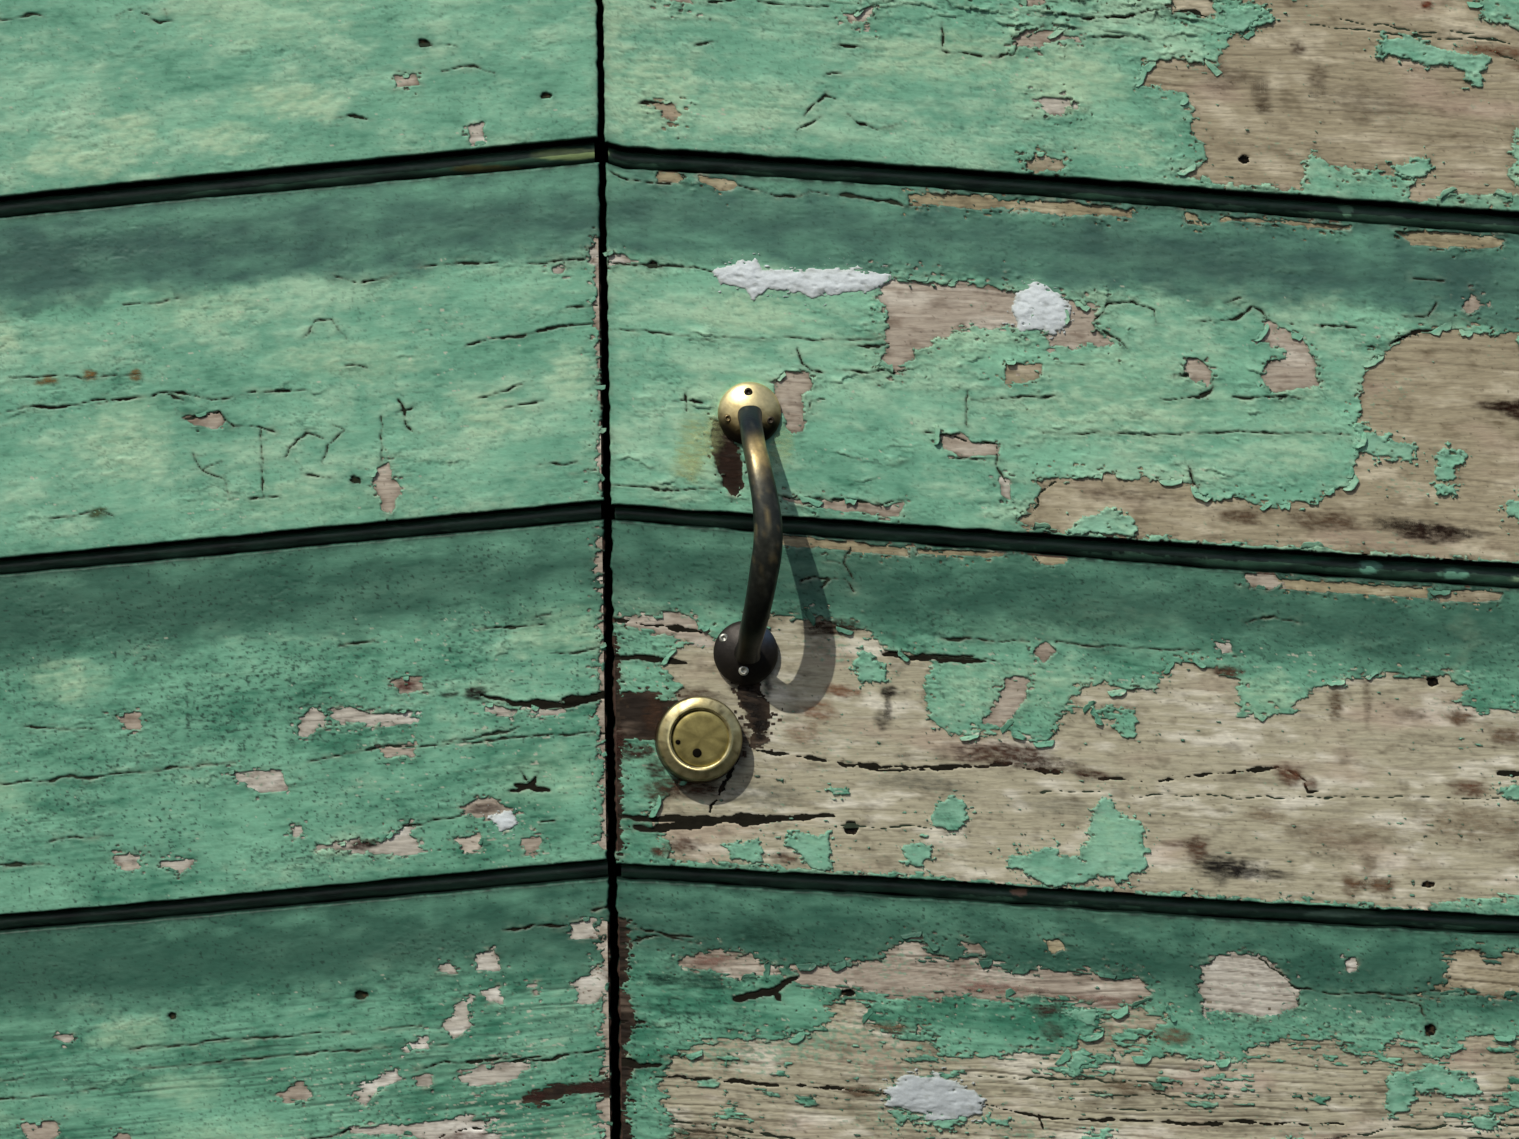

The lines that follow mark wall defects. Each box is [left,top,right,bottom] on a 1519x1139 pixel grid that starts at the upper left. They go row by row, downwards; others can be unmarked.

crack [800,45,873,129]
peeling [1133,0,1519,209]
peeling [868,260,1130,388]
crack [27,375,342,500]
peeling [932,285,1519,562]
crack [3,764,217,785]
peeling [291,671,428,765]
crack [311,614,702,761]
crack [510,775,555,822]
peeling [586,526,1519,910]
crack [136,1032,362,1065]
peeling [340,916,1519,1139]